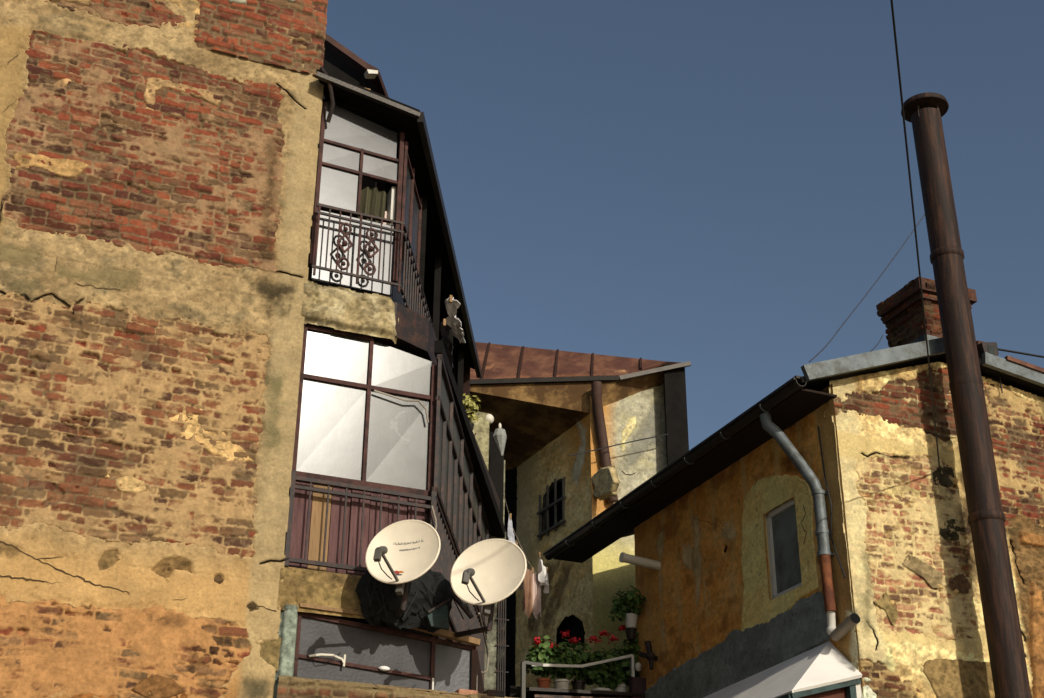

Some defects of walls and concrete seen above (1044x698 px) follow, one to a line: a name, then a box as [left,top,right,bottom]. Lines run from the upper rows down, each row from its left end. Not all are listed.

flaking render [44,0,200,38]
flaking render [1,30,287,273]
crack [0,262,122,313]
flaking render [0,292,271,570]
flaking render [834,367,957,442]
flaking render [983,383,1044,532]
crack [0,541,129,593]
spalling [152,557,192,582]
flaking render [855,451,979,642]
flaking render [0,595,281,698]